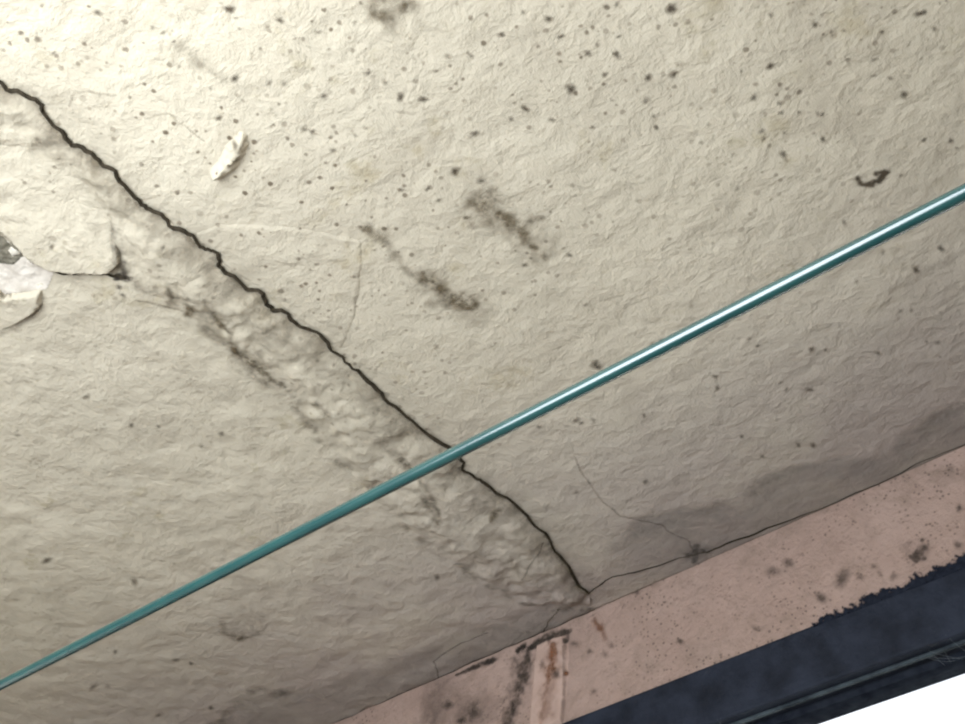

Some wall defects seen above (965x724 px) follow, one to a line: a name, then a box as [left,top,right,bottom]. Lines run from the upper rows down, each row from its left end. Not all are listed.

flaking render [0,192,130,331]
water stain [419,275,478,311]
crack [0,80,965,595]
water stain [468,197,545,257]
water stain [909,539,927,562]
crack [336,609,595,723]
water stain [504,629,570,724]